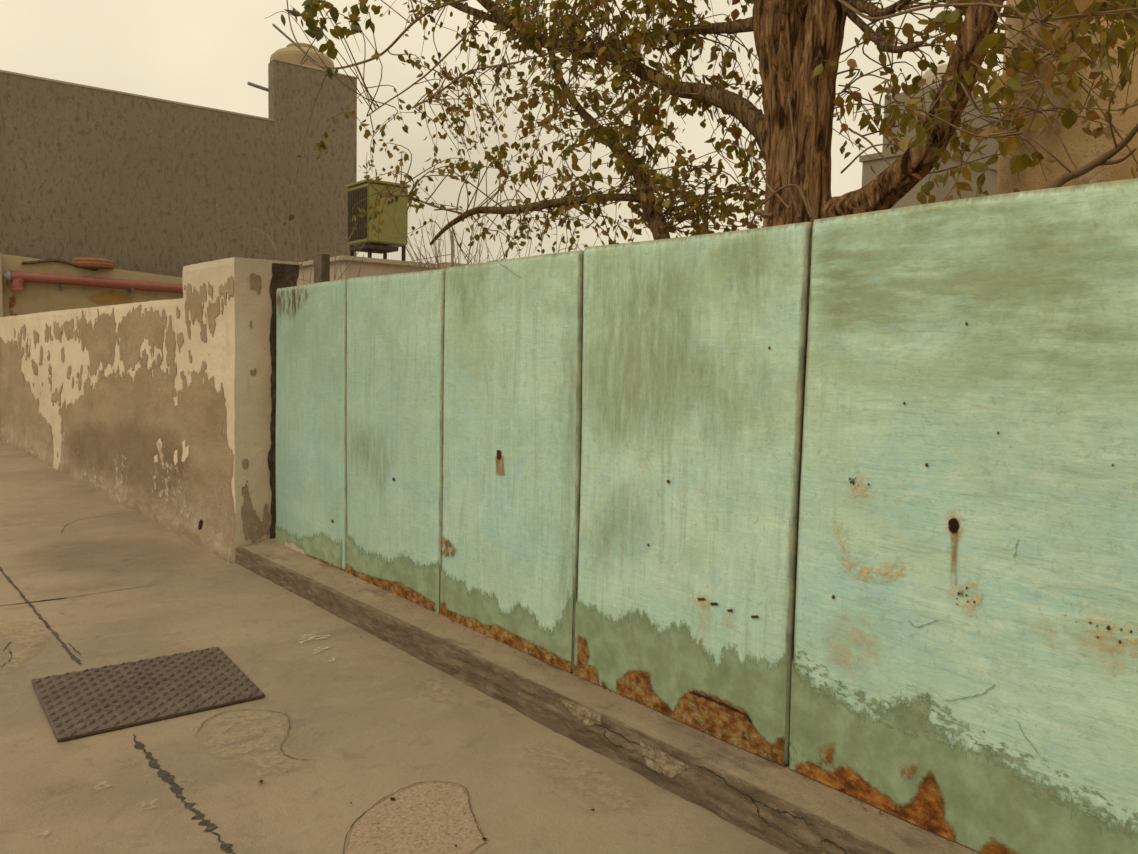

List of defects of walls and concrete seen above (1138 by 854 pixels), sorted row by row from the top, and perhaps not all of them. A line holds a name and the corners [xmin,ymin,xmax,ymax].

peeling [0,263,1138,854]
rust [283,541,956,842]
crack [698,766,848,854]
rust [980,841,1016,854]